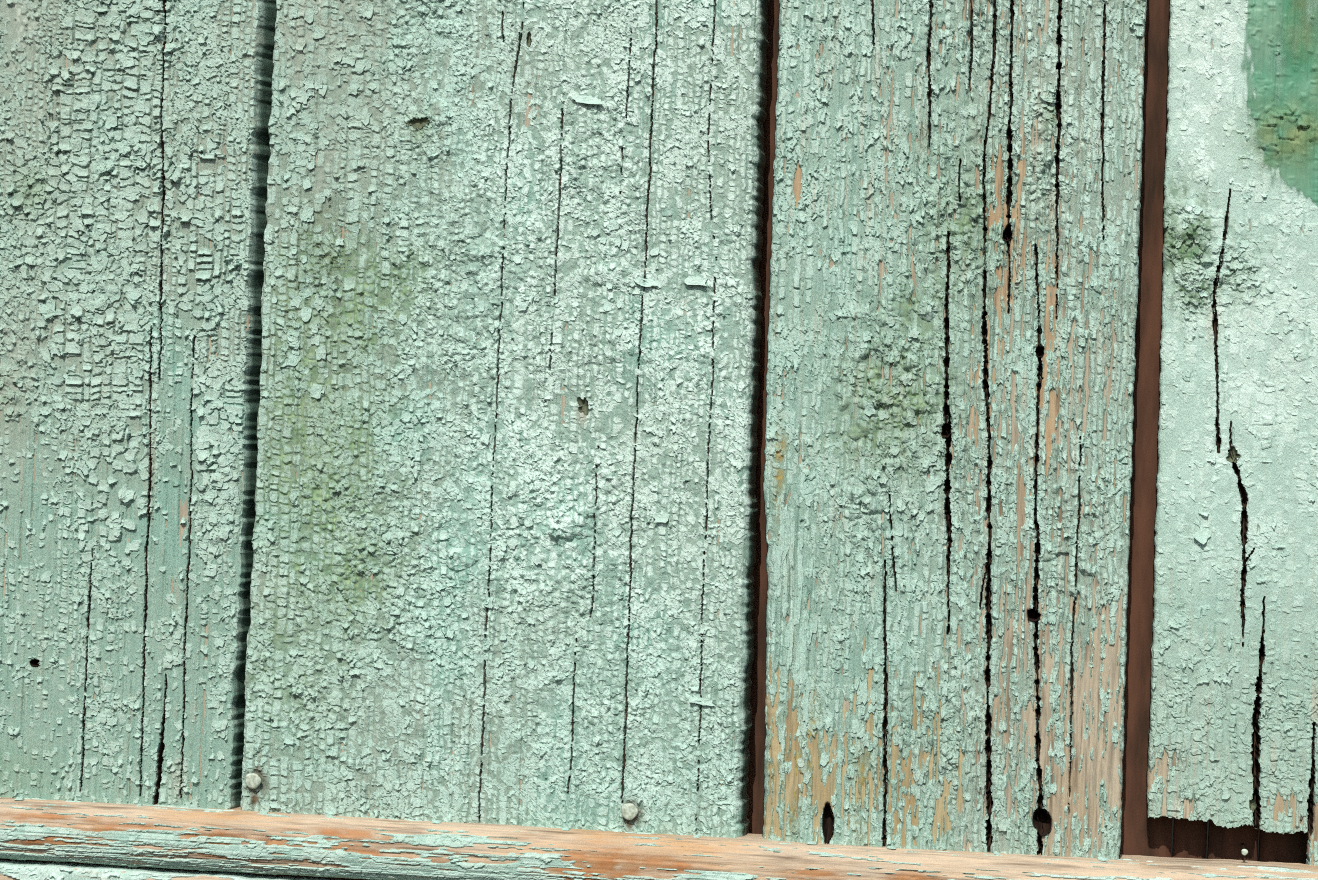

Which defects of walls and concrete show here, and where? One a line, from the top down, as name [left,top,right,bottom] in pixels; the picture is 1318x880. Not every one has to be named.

crack [925,0,933,144]
leakage [1246,0,1318,205]
crack [80,548,94,792]
crack [140,0,195,805]
peeling [763,495,964,848]
peeling [838,471,909,536]
crack [882,498,896,847]
peeling [864,124,1027,493]
crack [944,0,1081,854]
peeling [1026,253,1063,475]
peeling [1025,574,1127,858]
crack [1213,190,1264,829]